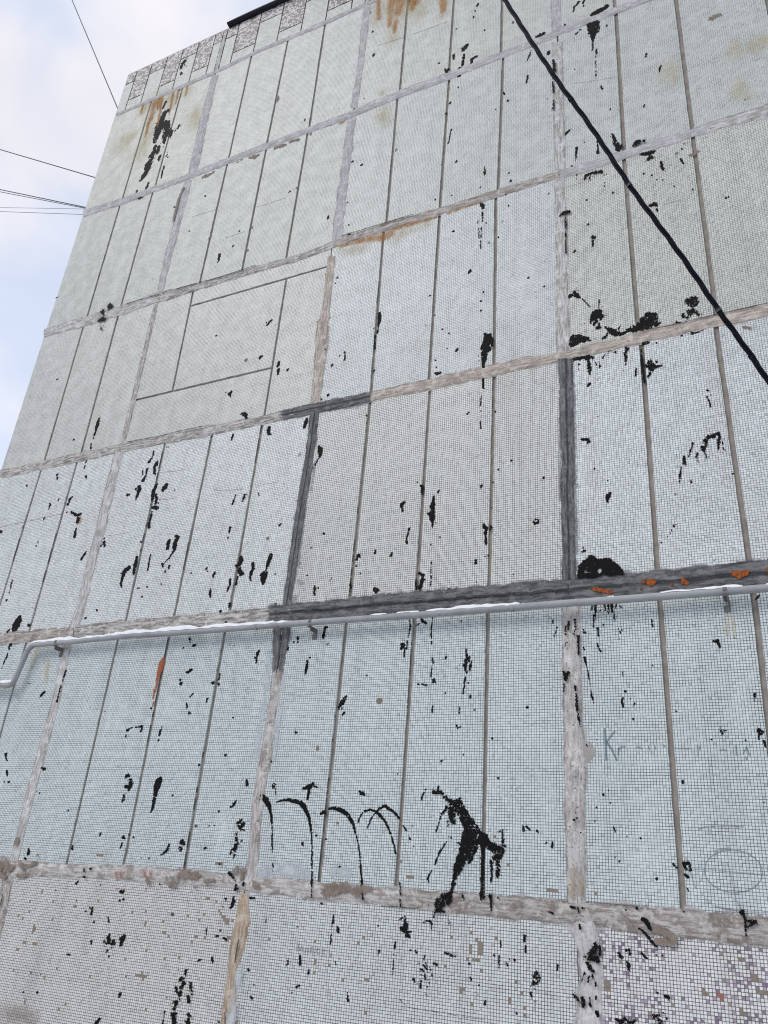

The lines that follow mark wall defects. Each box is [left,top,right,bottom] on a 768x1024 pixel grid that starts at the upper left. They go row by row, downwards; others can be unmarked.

rust [378,0,417,32]
rust [140,85,188,134]
rust [731,569,749,579]
rust [152,657,165,707]